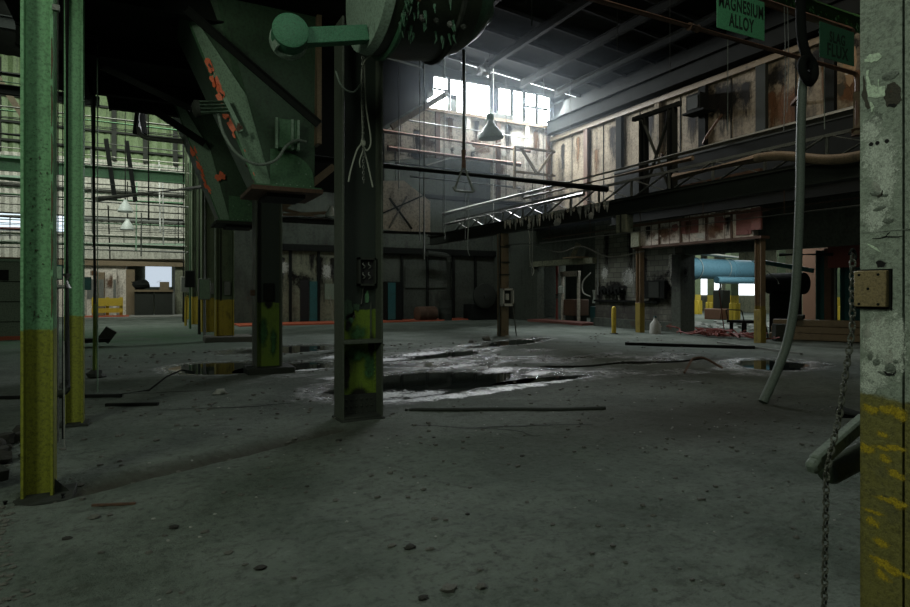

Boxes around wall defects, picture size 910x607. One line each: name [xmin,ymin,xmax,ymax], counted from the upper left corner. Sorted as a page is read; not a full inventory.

leakage [708,79,751,134]
peeling [837,46,903,125]